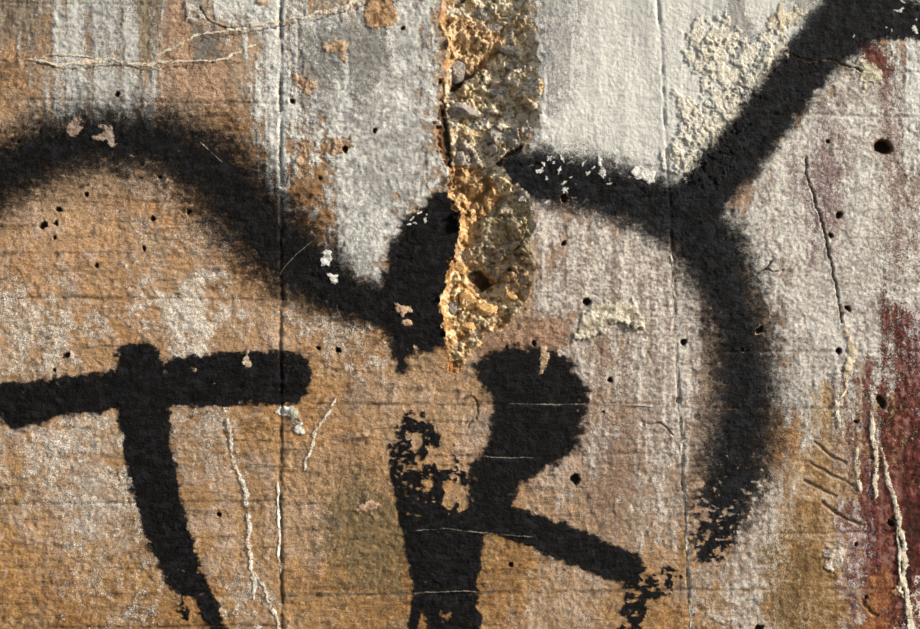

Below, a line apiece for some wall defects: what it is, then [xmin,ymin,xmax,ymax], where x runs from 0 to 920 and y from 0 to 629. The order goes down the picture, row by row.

crack [26,0,372,72]
spalling [432,0,545,374]
peeling [536,155,572,194]
crack [804,158,842,323]
rust [689,40,920,629]